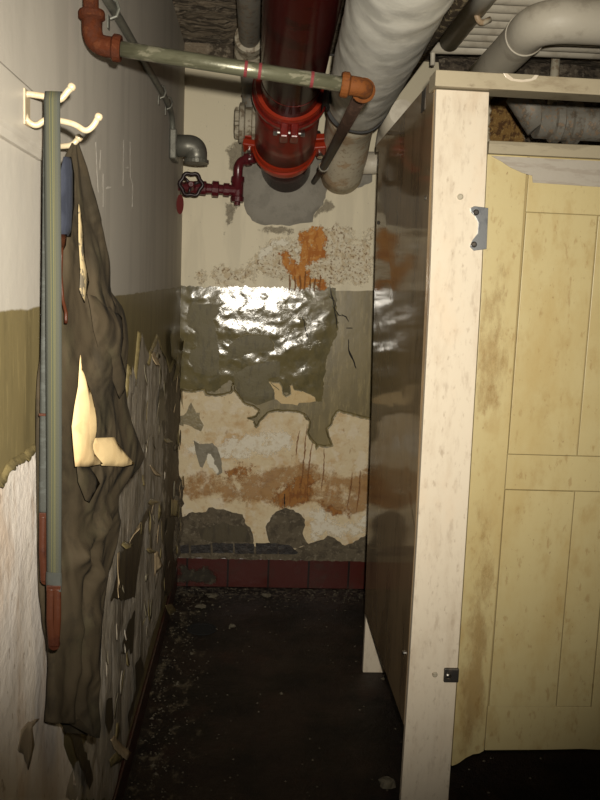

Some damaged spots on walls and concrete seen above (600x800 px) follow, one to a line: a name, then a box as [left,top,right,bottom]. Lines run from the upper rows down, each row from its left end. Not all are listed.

peeling [194,223,375,290]
rust [279,226,327,291]
crack [329,288,356,368]
peeling [0,325,371,800]